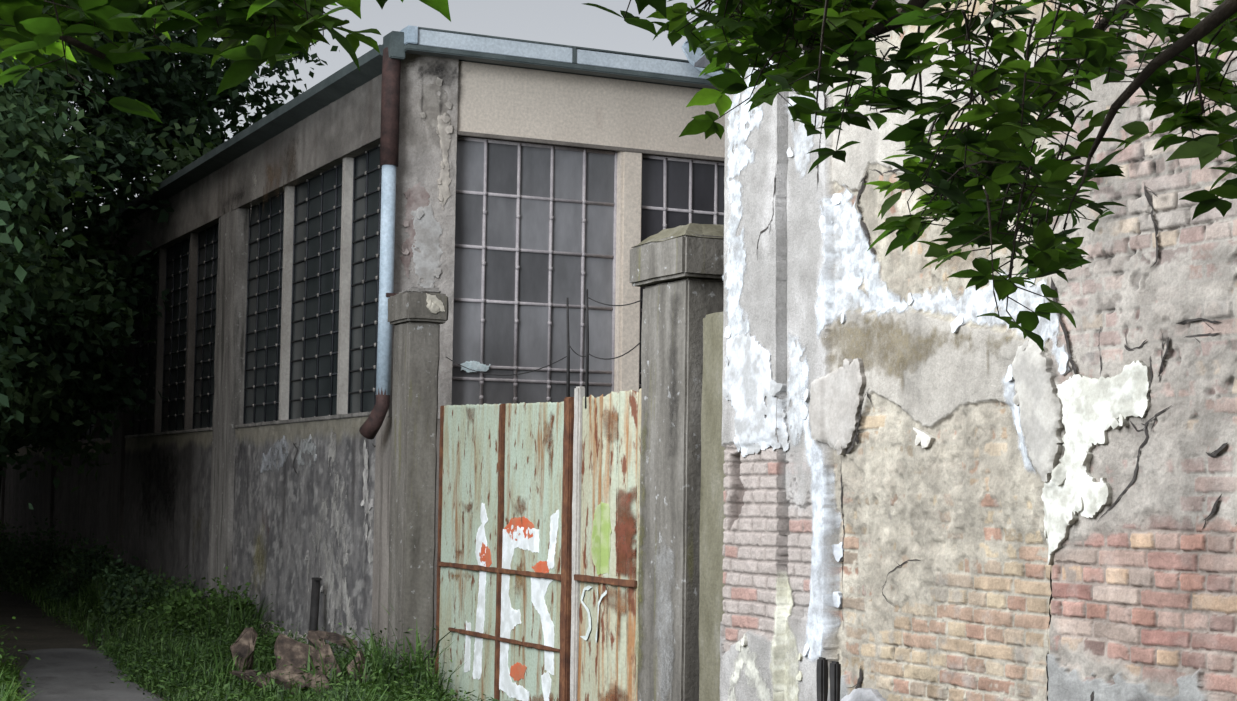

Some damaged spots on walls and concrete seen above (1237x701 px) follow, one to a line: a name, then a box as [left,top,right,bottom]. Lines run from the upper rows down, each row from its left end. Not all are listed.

peeling [400,77,453,314]
rust [602,413,618,442]
rust [603,488,637,646]
flaking render [720,54,1237,701]
crack [1051,278,1222,522]
crack [1206,443,1227,458]
crack [1202,494,1237,529]
rust [600,682,627,701]